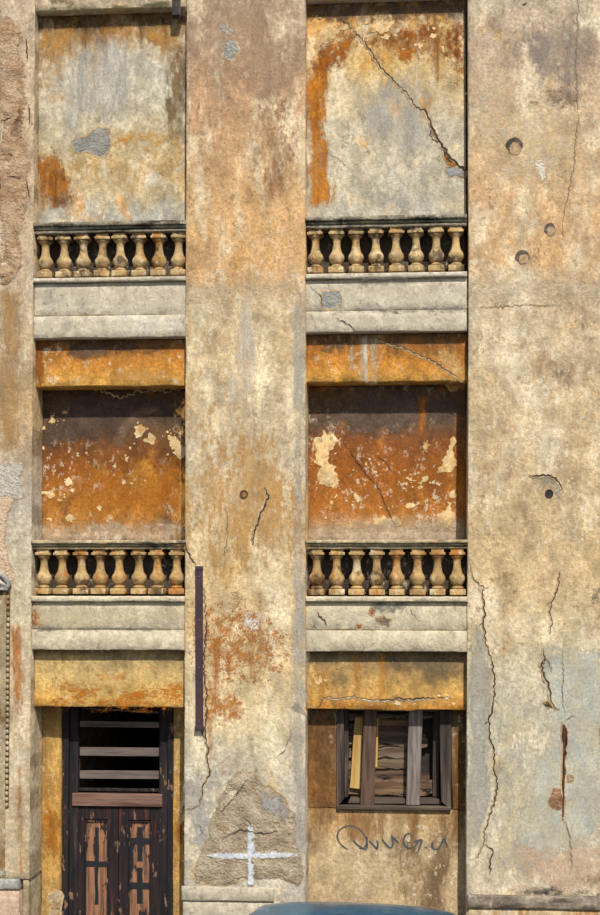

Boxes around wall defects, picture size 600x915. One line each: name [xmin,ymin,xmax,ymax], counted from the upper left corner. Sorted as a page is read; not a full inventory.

flaking render [0,11,31,284]
flaking render [70,125,113,159]
rust [307,22,464,82]
crack [340,17,466,171]
peeling [107,422,185,485]
peeling [312,430,360,507]
peeling [365,436,458,527]
crack [186,587,291,838]
rust [189,599,293,725]
crack [317,695,454,708]
crack [469,566,498,875]
crack [538,571,575,720]